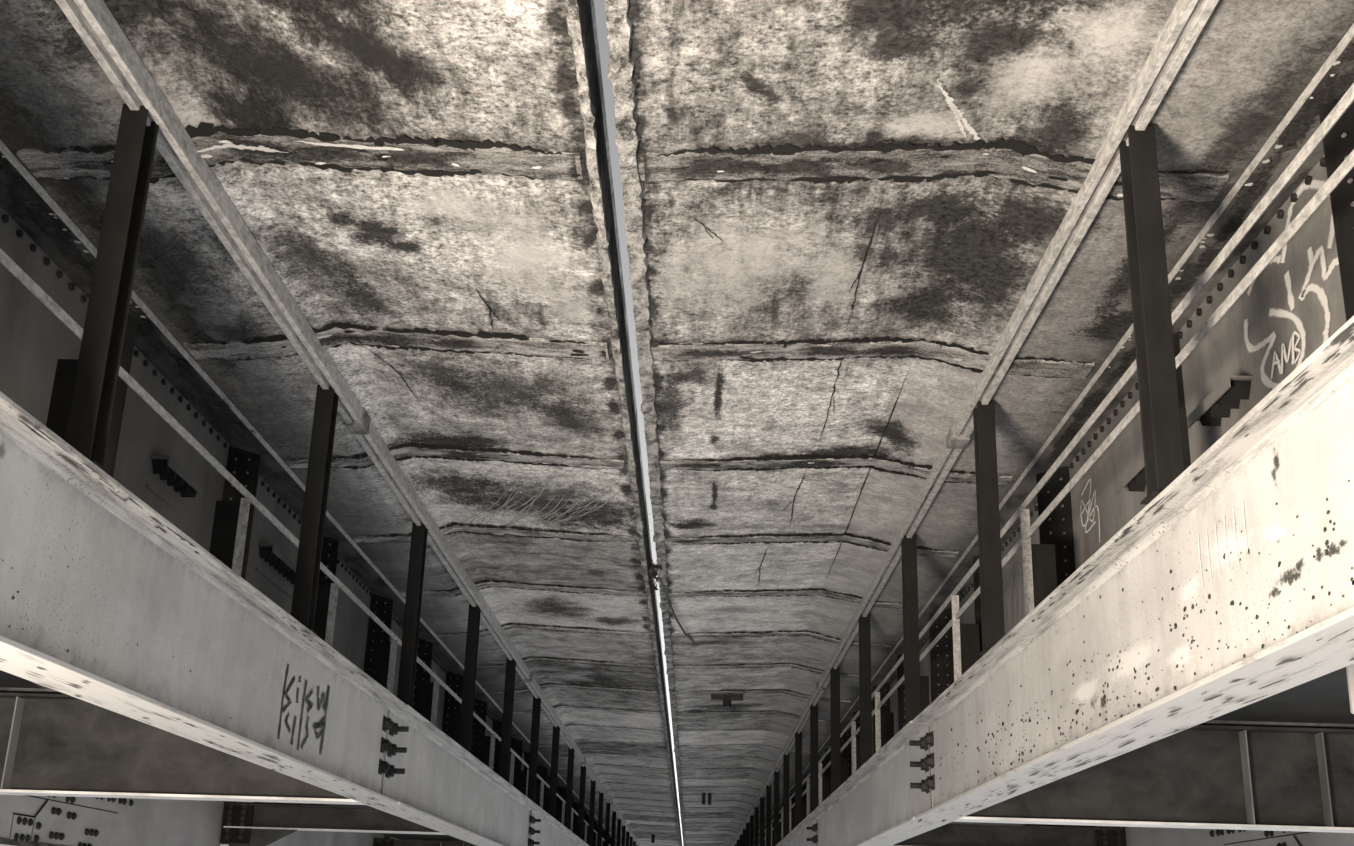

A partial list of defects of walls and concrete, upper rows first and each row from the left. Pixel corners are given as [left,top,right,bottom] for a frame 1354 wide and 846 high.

water stain [40,0,97,76]
water stain [103,0,200,85]
water stain [260,0,459,100]
water stain [829,0,1091,103]
spalling [40,146,116,181]
spalling [150,160,176,184]
water stain [177,79,396,153]
spalling [185,122,568,180]
water stain [752,101,957,150]
water stain [992,104,1090,158]
crack [754,206,883,584]
crack [824,358,914,585]